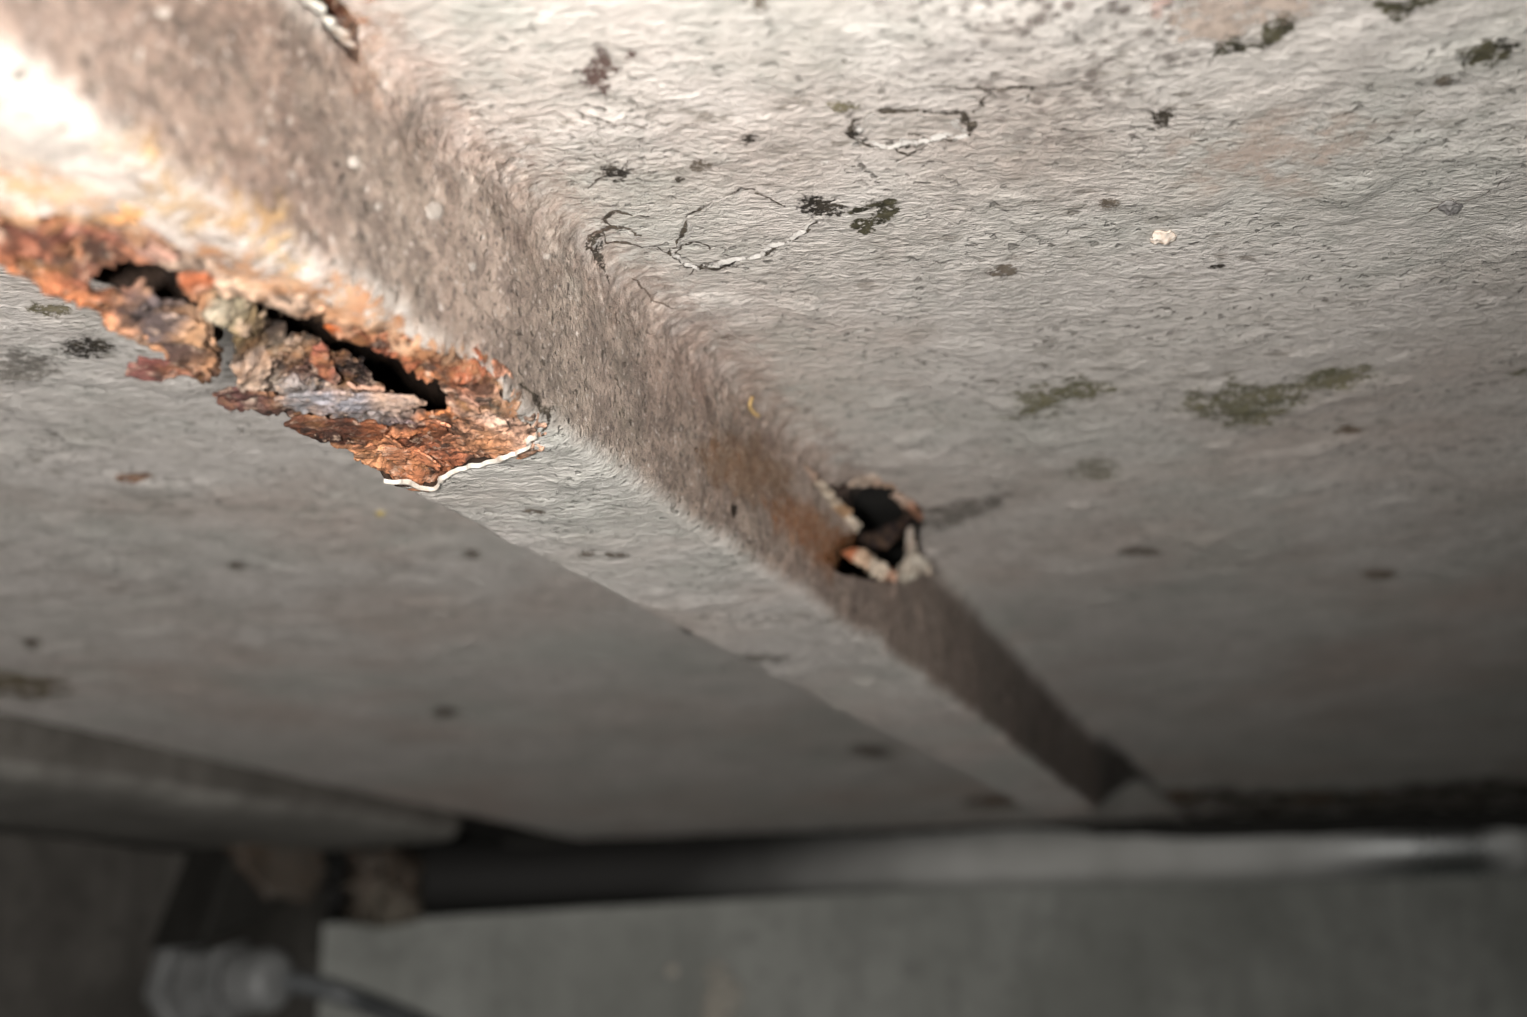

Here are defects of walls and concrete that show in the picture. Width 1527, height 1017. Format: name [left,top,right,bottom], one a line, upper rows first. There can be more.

rust [319,0,370,25]
crack [575,110,669,130]
crack [845,82,1073,156]
peeling [89,213,131,226]
crack [585,187,818,309]
peeling [124,311,218,383]
rust [0,139,547,492]
peeling [273,323,427,445]